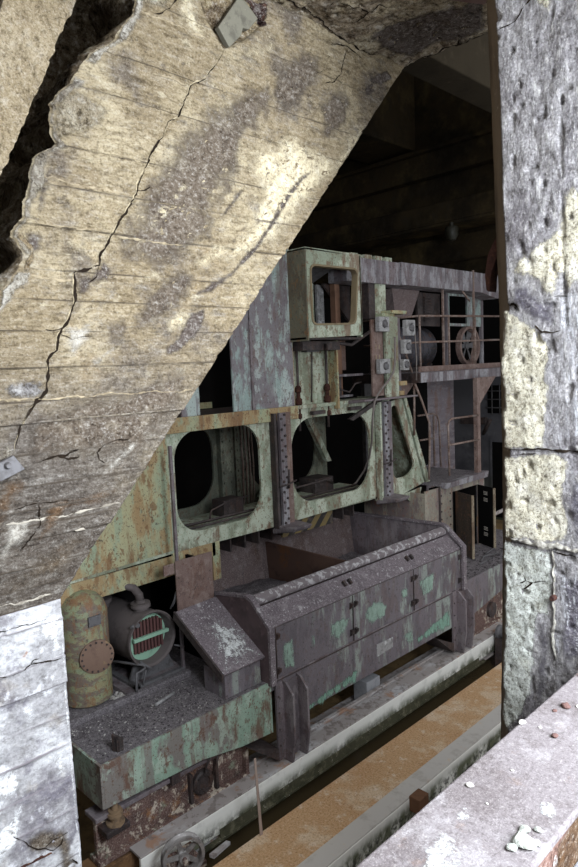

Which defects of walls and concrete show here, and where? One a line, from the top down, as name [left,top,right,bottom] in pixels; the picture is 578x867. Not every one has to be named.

crack [406,0,530,65]
spalling [0,78,105,309]
crack [14,52,222,450]
crack [16,500,74,552]